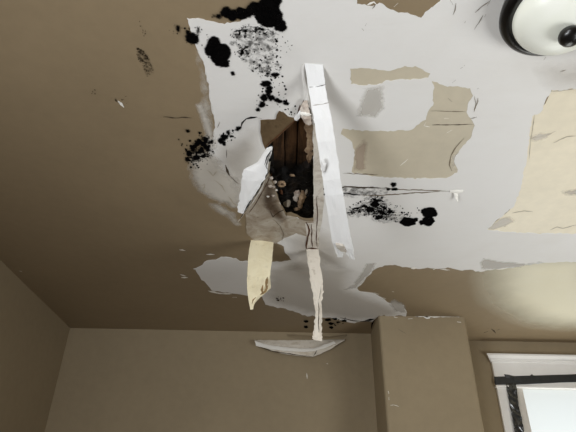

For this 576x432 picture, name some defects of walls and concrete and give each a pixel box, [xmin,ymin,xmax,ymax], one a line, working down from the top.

leakage [169,25,202,45]
leakage [204,0,296,115]
peeling [357,0,440,18]
leakage [178,126,241,168]
peeling [341,66,475,179]
peeling [488,88,576,234]
peeling [245,174,314,244]
leakage [347,195,438,227]